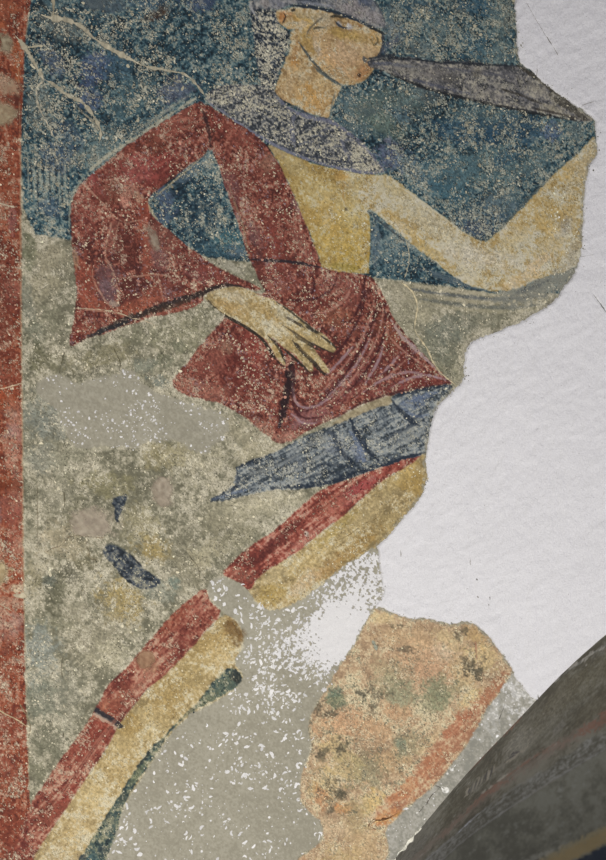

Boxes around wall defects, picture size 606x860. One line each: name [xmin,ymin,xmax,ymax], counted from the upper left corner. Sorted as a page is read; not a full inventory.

crack [15,35,102,142]
crack [41,0,205,96]
peeling [268,552,383,681]